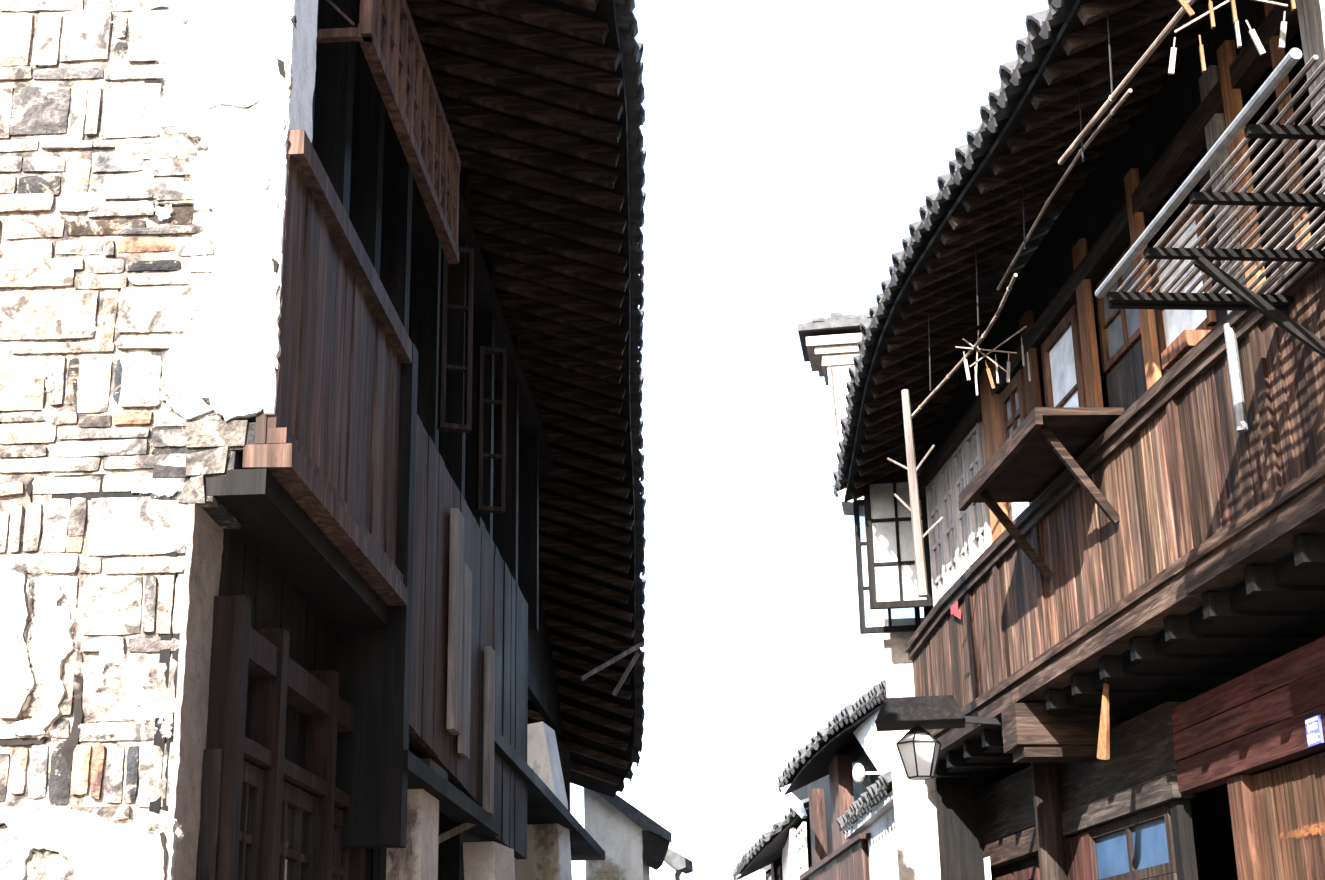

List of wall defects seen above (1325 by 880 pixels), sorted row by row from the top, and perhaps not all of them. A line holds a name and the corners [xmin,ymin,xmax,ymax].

crack [198,92,280,109]
peeling [154,205,171,221]
peeling [158,0,297,422]
peeling [135,480,180,498]
crack [16,570,32,674]
peeling [0,577,76,736]
peeling [82,645,173,736]
peeling [0,809,177,880]